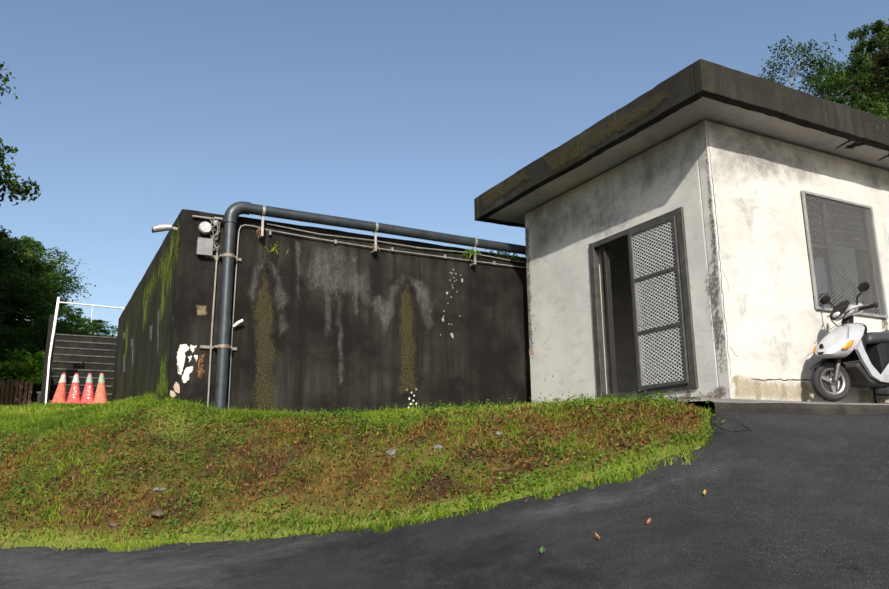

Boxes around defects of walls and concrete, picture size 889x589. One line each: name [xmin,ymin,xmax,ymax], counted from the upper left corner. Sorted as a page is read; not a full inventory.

peeling [170,344,198,397]